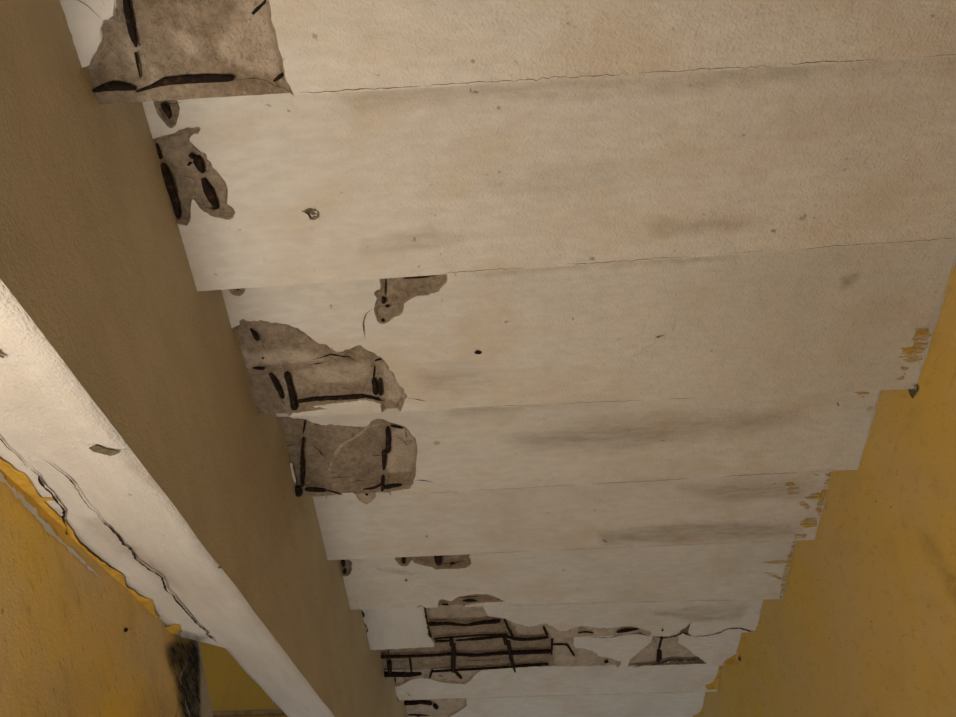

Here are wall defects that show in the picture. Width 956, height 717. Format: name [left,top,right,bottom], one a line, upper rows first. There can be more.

spalling [60,0,294,226]
spalling [374,274,447,324]
spalling [233,319,418,505]
crack [0,438,217,643]
spalling [395,554,471,570]
spalling [380,594,708,687]
crack [653,628,753,639]
spalling [404,699,467,717]